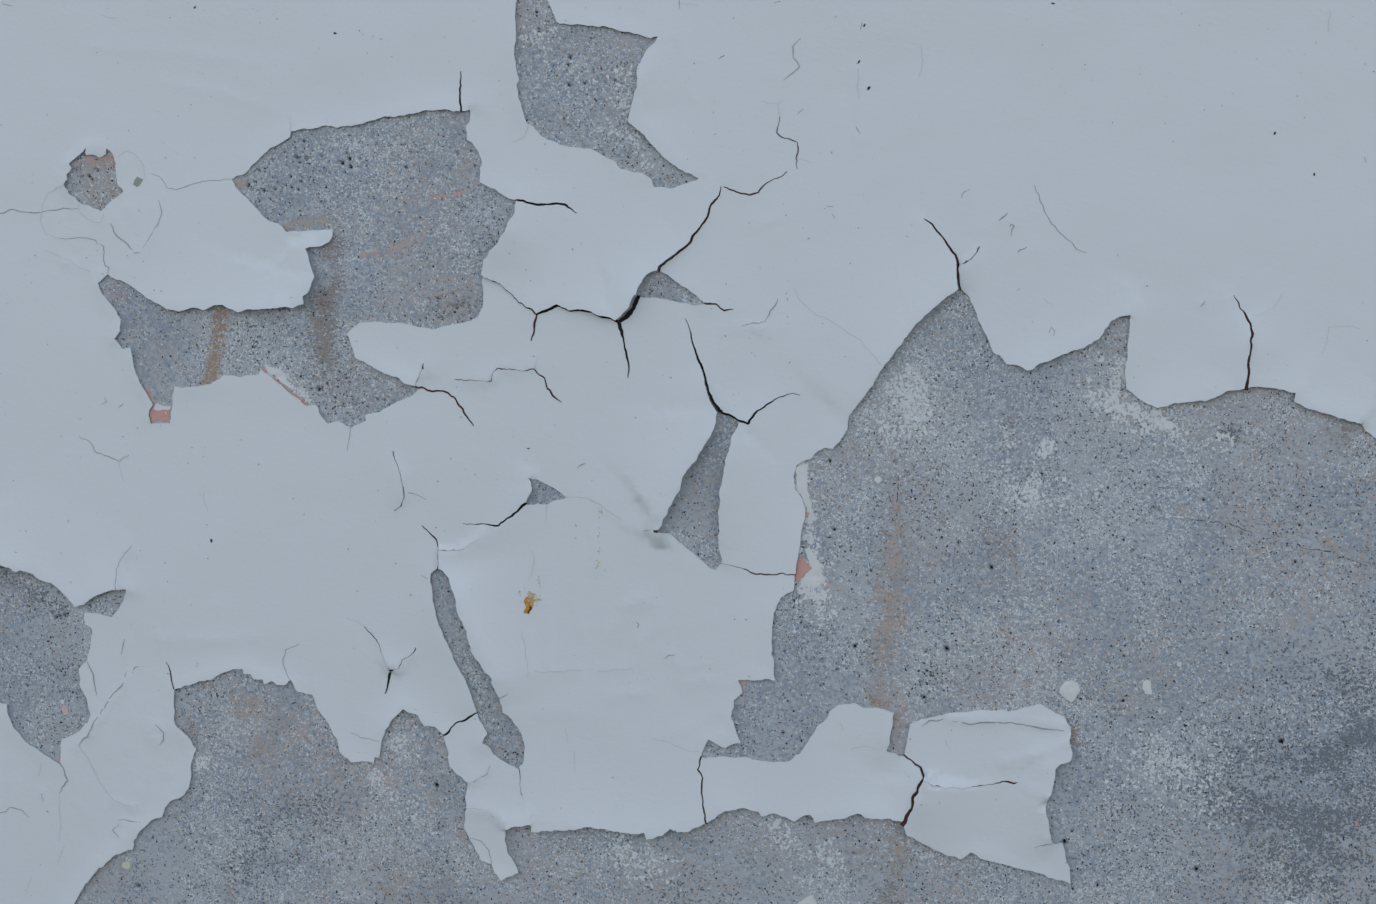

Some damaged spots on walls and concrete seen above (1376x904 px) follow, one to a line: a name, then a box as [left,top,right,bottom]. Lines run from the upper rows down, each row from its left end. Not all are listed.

spalling [64,149,143,210]
crack [0,151,223,273]
spalling [514,0,699,189]
crack [415,38,808,426]
crack [685,287,881,425]
peeling [0,493,131,763]
corrosion [518,575,542,614]
peeling [75,496,985,904]
spalling [344,108,1376,904]